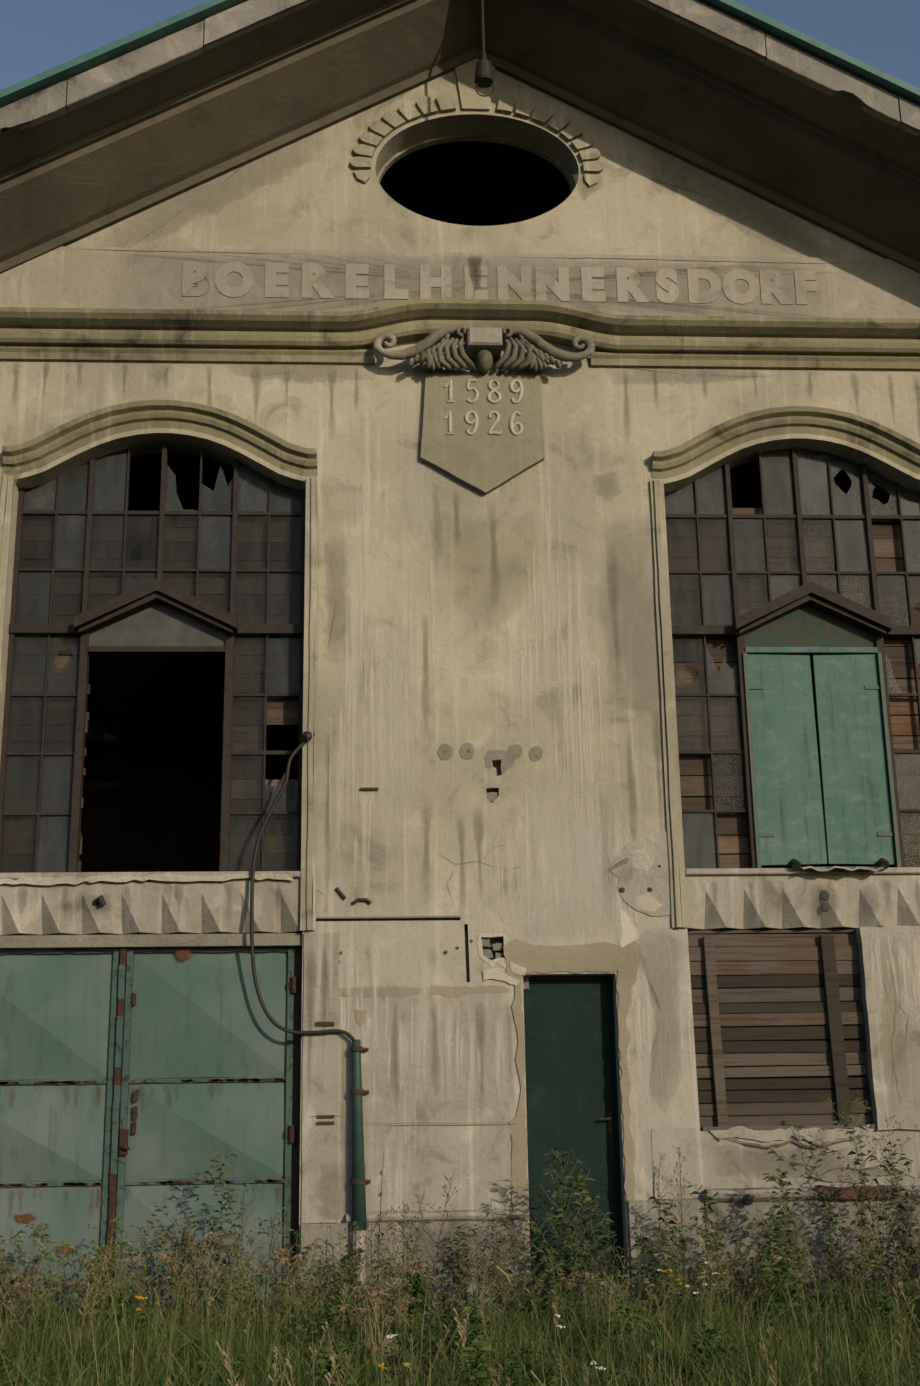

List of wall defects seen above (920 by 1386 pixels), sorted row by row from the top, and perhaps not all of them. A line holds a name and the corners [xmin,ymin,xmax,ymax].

water stain [490,799,640,947]
spalling [710,1124,901,1199]
rust [15,1214,36,1223]